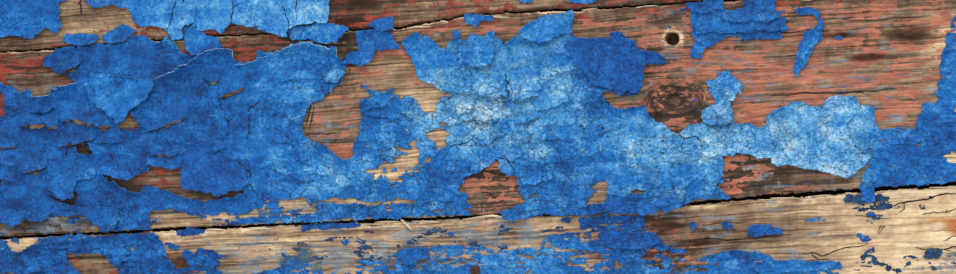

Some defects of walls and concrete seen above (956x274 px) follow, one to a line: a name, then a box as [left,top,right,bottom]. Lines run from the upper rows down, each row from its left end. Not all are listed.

peeling [0,191,129,274]
peeling [0,0,171,155]
peeling [102,90,611,274]
peeling [109,0,956,159]
peeling [627,153,956,274]
peeling [943,151,956,163]